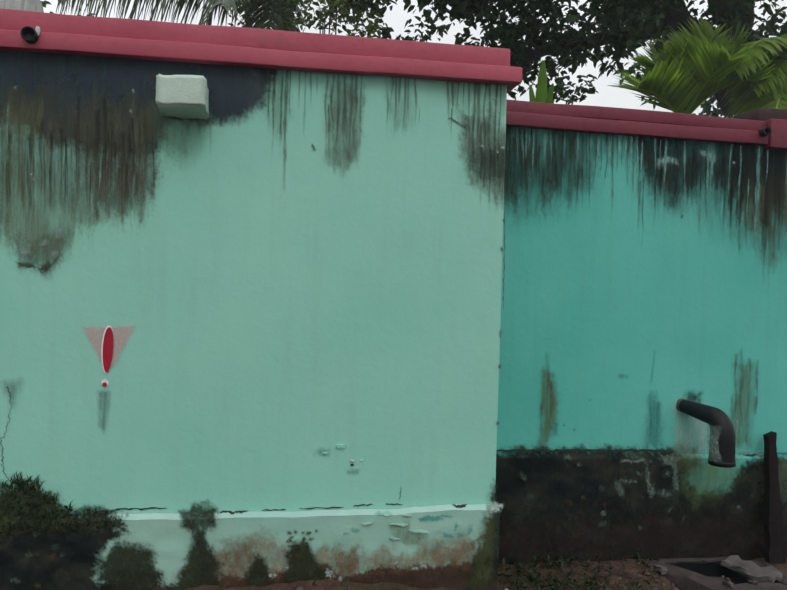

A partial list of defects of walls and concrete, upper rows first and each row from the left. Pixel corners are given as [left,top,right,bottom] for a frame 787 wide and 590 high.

leakage [0,50,287,254]
leakage [463,114,583,199]
leakage [598,136,787,226]
crack [0,386,13,480]
rust [542,374,557,440]
leakage [495,446,765,565]
leakage [778,457,787,558]